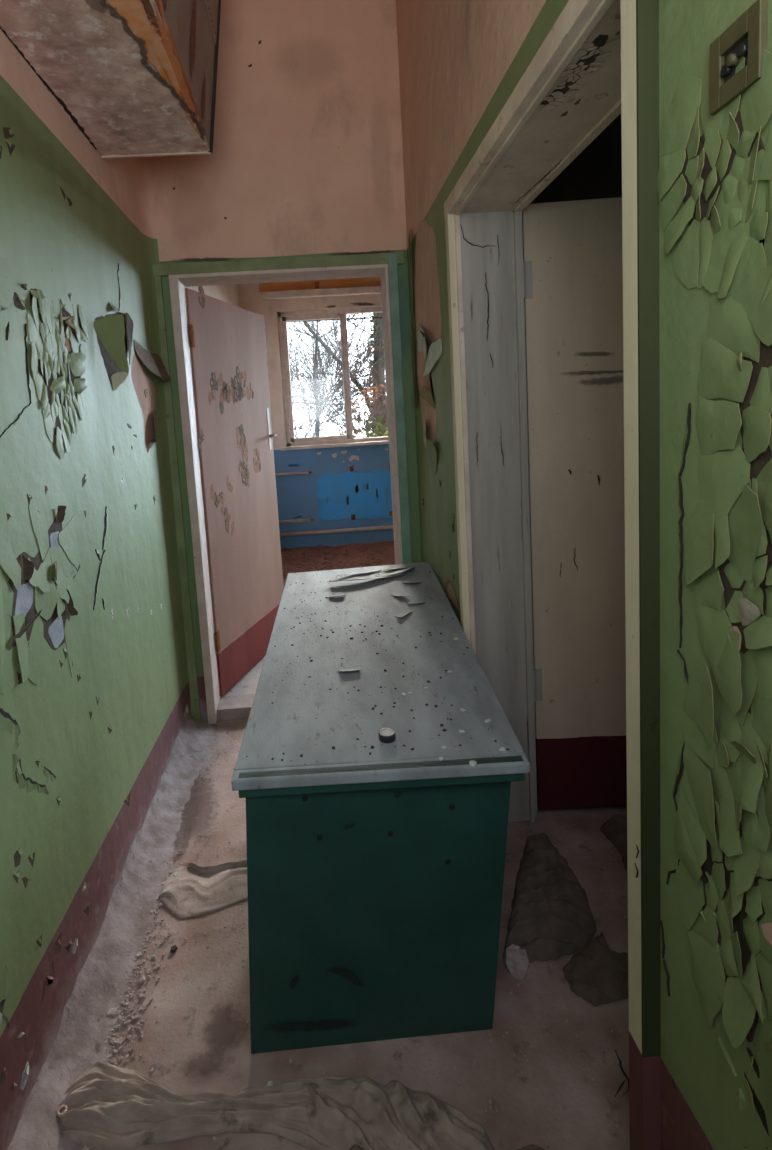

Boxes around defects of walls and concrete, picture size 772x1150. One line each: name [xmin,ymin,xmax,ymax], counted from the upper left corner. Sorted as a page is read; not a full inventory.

crack [0,324,31,439]
peeling [1,283,171,459]
peeling [408,220,443,488]
peeling [0,486,86,695]
peeling [658,49,772,1136]
peeling [13,848,35,888]